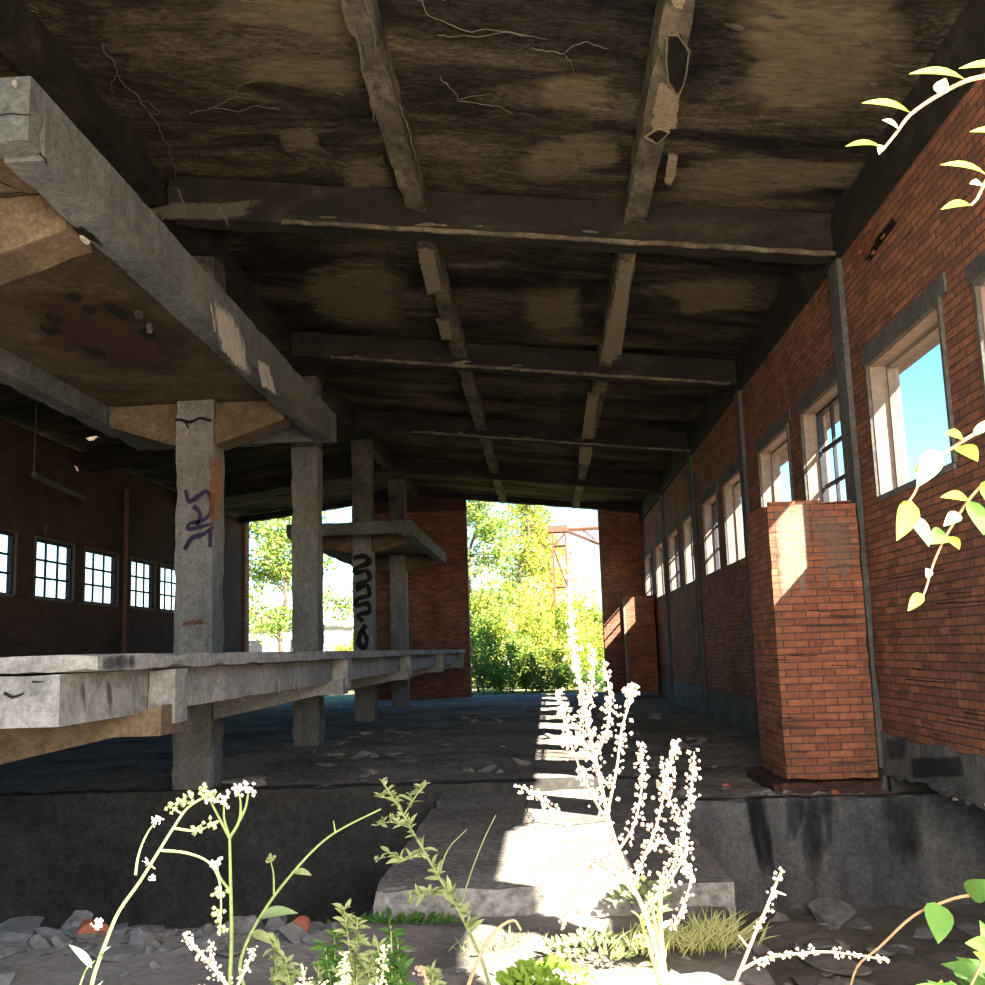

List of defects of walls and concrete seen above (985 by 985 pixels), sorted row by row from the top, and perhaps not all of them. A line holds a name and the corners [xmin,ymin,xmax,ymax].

crack [419,0,607,71]
crack [440,76,511,113]
peeling [537,75,615,108]
spalling [644,32,691,144]
peeling [516,133,621,181]
crack [175,417,212,429]
leakage [749,799,772,866]
leakage [787,798,830,858]